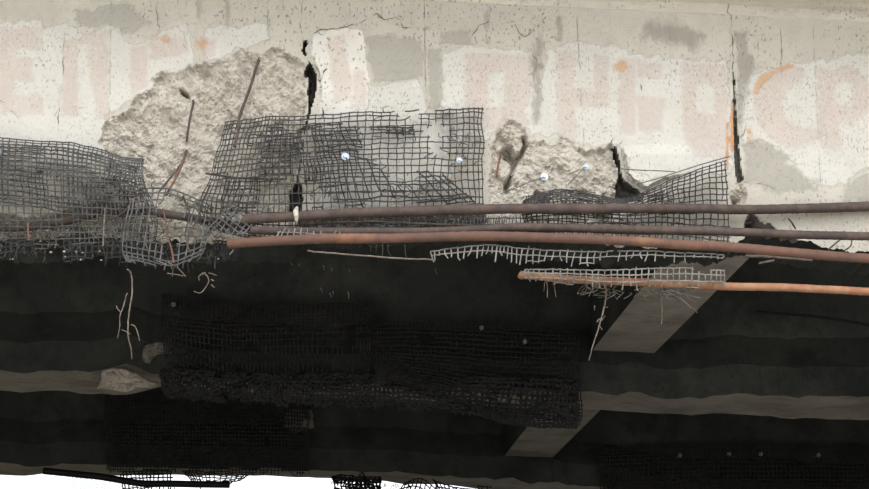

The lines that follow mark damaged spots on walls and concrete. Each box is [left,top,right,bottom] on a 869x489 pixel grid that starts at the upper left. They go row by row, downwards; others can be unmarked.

crack [289,0,427,212]
peeling [0,19,869,245]
crack [726,4,775,189]